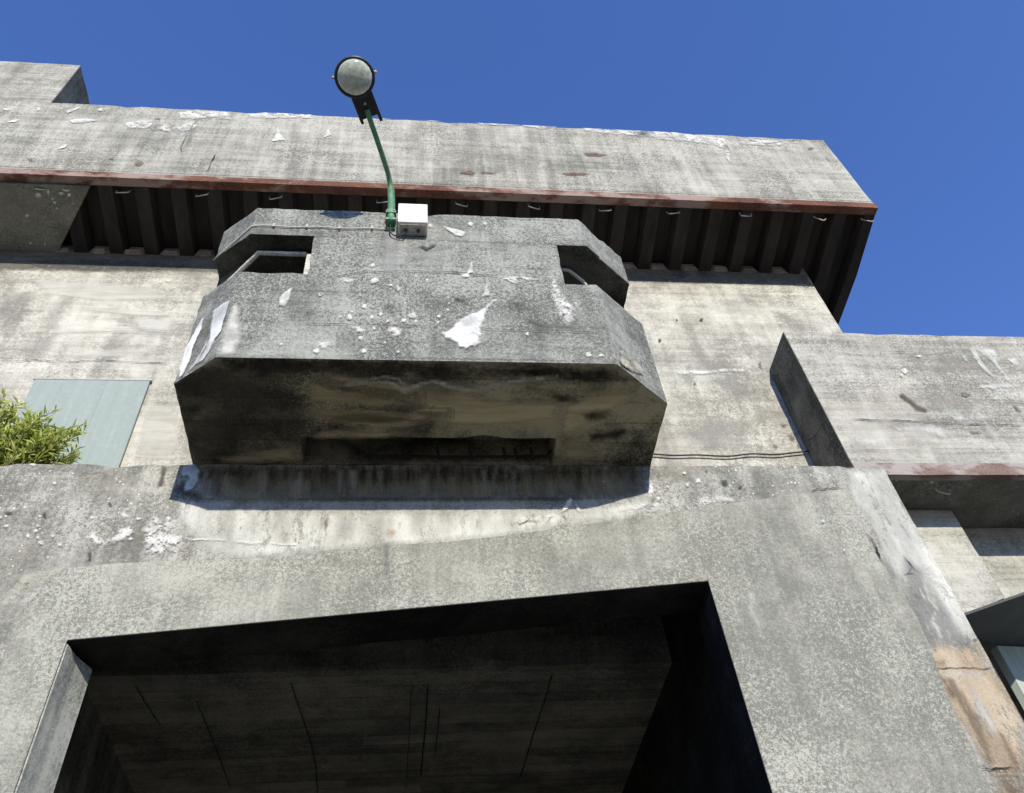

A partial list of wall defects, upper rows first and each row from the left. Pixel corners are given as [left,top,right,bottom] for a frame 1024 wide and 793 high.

peeling [444,285,495,348]
damp [144,306,610,449]
damp [90,466,659,557]